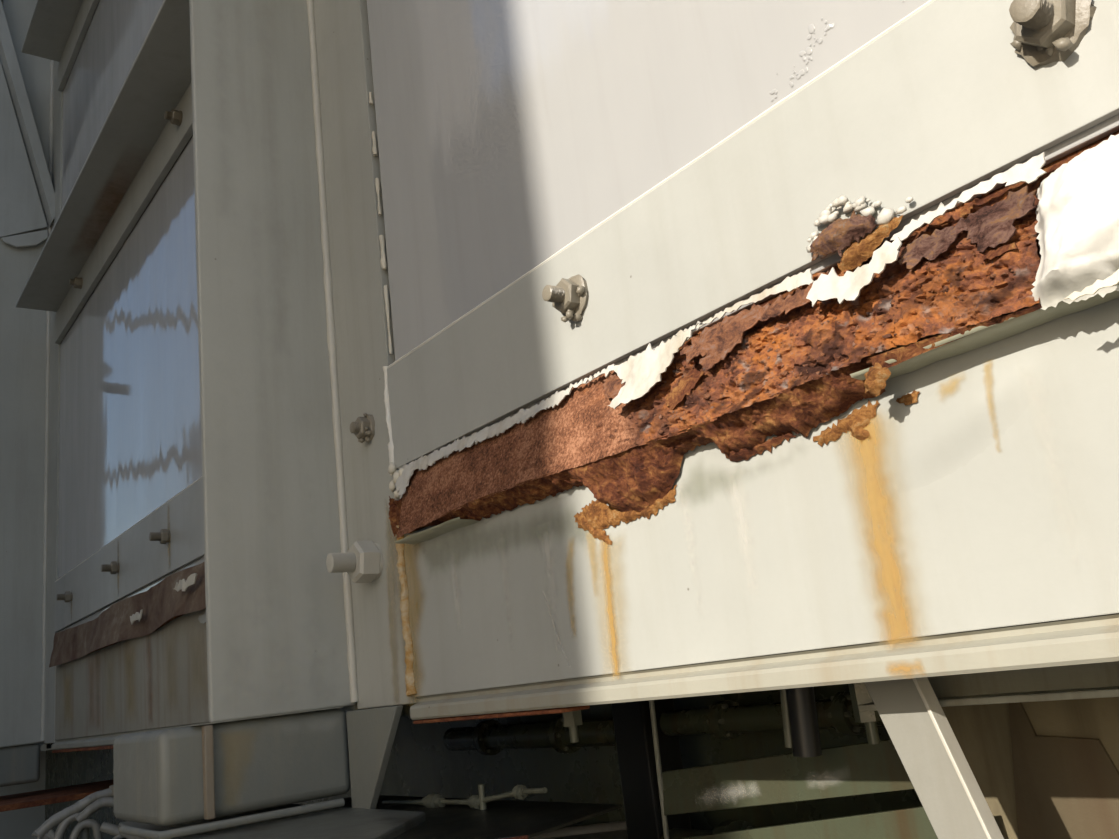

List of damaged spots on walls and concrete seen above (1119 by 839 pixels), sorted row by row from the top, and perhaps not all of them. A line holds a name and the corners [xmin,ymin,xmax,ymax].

corrosion [396,176,1042,696]
peeling [395,152,1047,499]